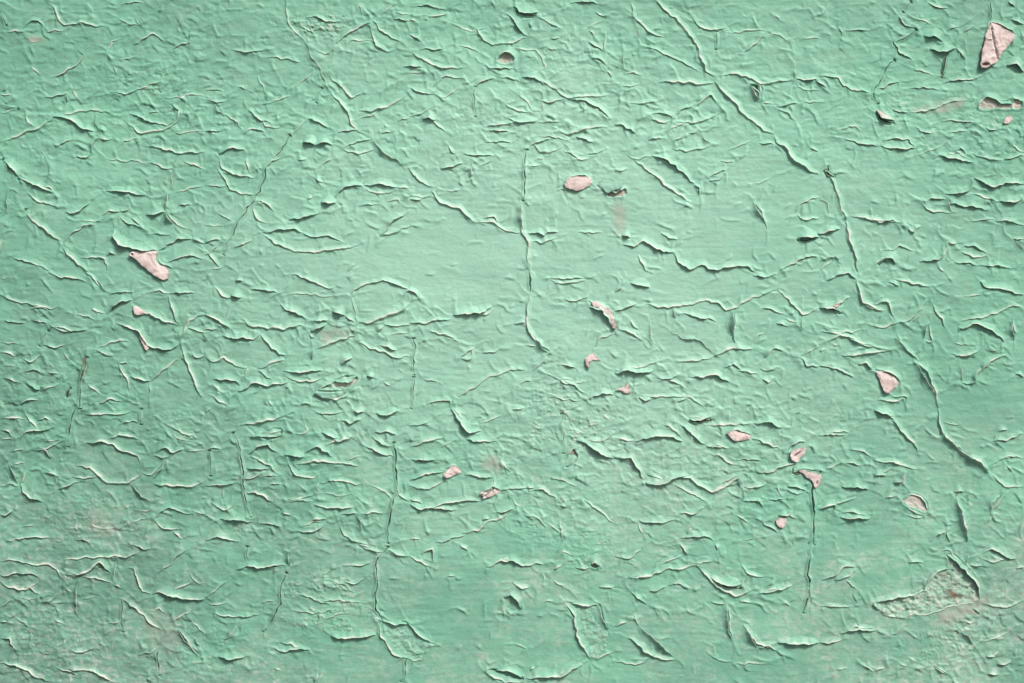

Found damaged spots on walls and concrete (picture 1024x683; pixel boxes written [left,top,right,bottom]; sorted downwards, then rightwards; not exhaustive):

peeling [980,19,1018,68]
crack [1,158,106,292]
peeling [112,229,232,280]
crack [408,150,550,354]
crack [655,0,1024,542]
peeling [858,358,902,394]
crack [358,425,410,622]
peeling [409,445,577,533]
peeling [725,425,821,488]
crack [794,466,820,613]
peeling [872,547,1024,619]
crack [614,589,675,666]